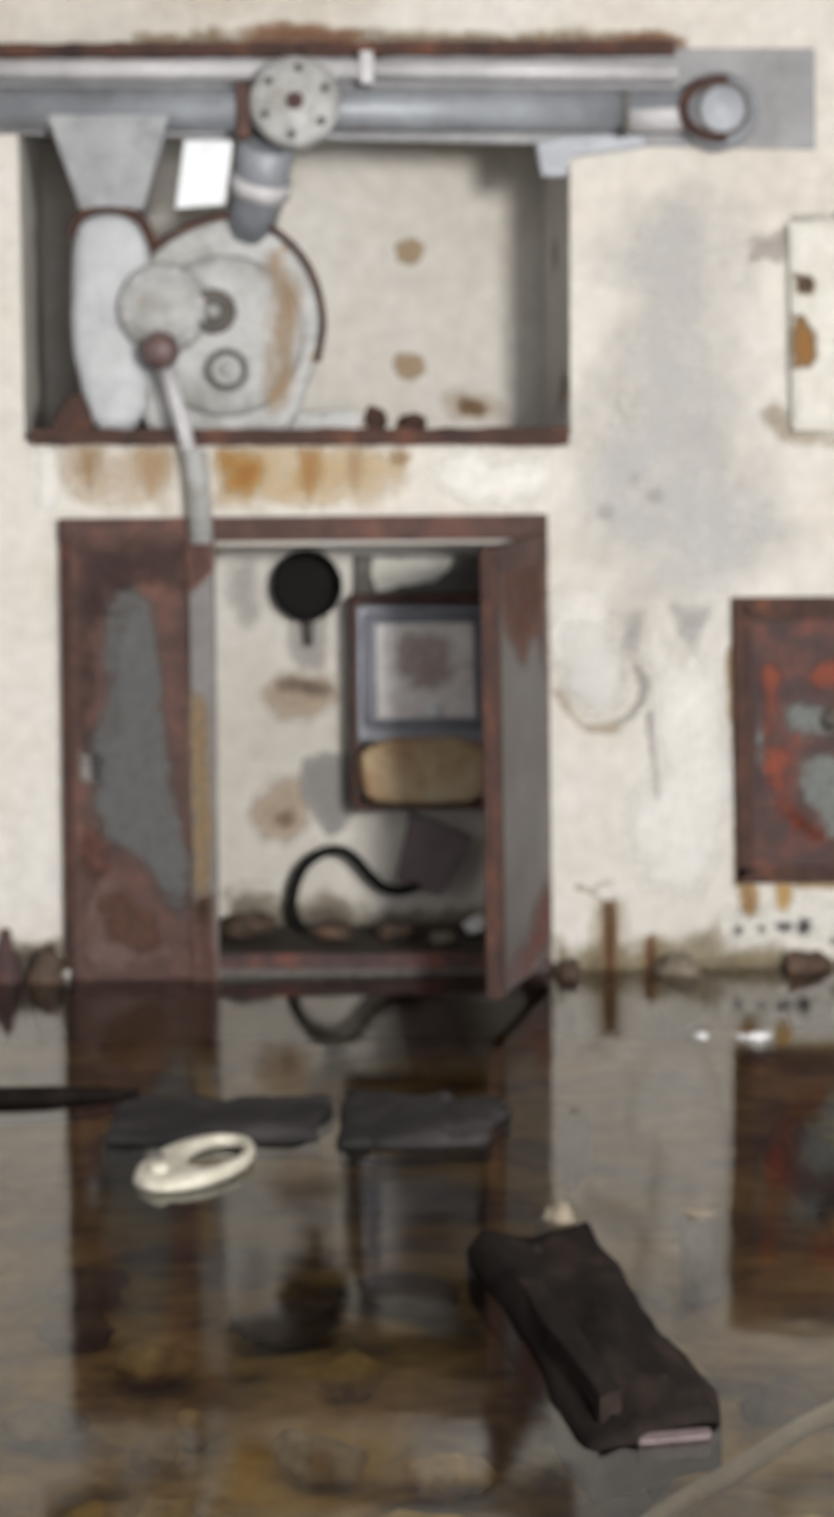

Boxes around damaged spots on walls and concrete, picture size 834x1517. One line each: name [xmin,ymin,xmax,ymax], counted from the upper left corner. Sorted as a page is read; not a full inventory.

corrosion [136,22,684,48]
corrosion [64,447,172,501]
corrosion [213,446,411,505]